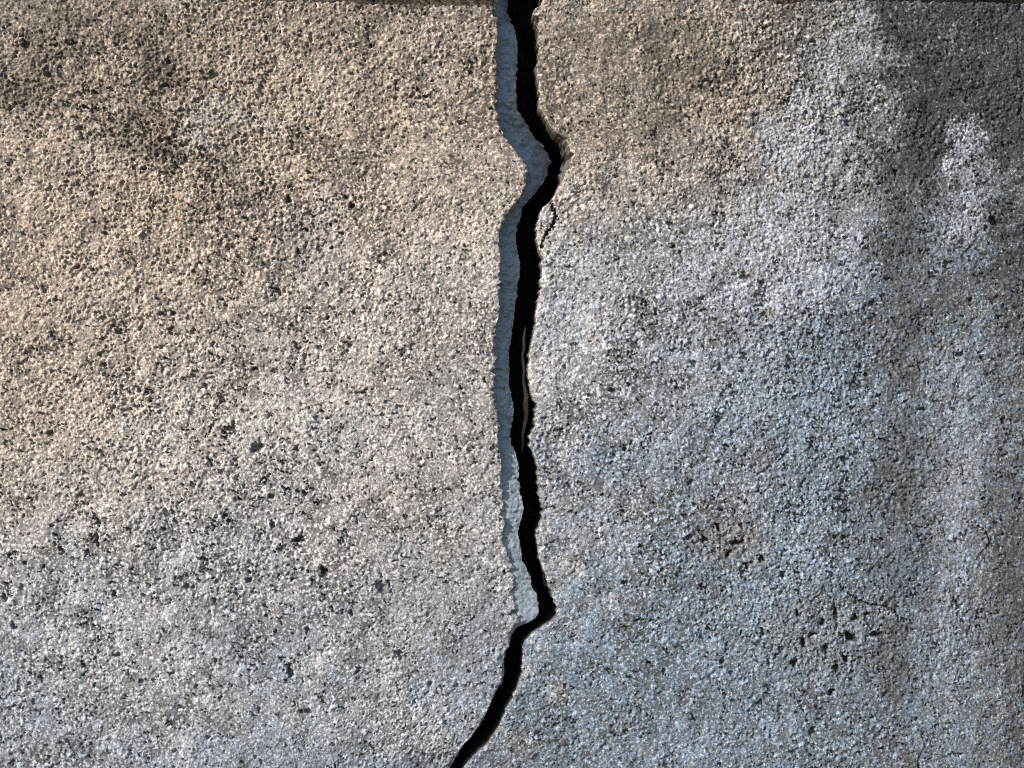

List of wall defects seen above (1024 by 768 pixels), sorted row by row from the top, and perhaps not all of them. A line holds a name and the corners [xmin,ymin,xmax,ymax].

crack [449,0,574,768]